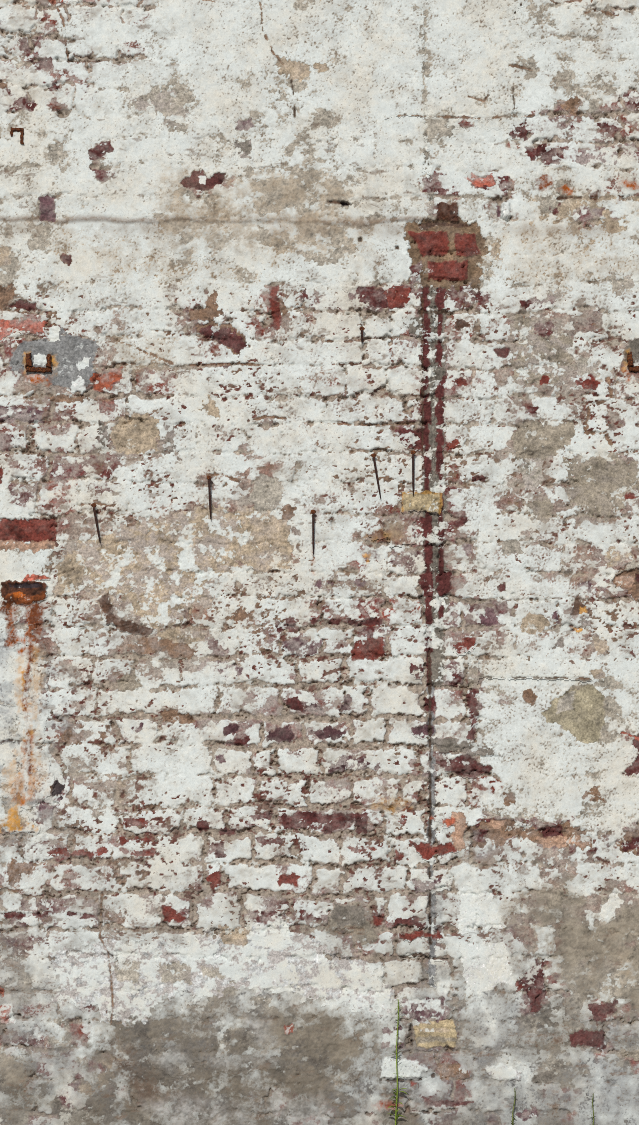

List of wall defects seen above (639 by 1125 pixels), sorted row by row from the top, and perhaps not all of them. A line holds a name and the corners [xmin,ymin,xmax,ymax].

crack [56,7,119,63]
crack [258,0,297,118]
rust [18,349,60,389]
flaking render [0,357,124,453]
rust [618,347,639,384]
peeling [0,472,297,682]
rust [0,591,56,835]
flaking render [215,693,353,763]
flaking render [272,616,385,664]
spalling [428,607,503,778]
peeling [520,577,609,745]
spalling [620,730,639,777]